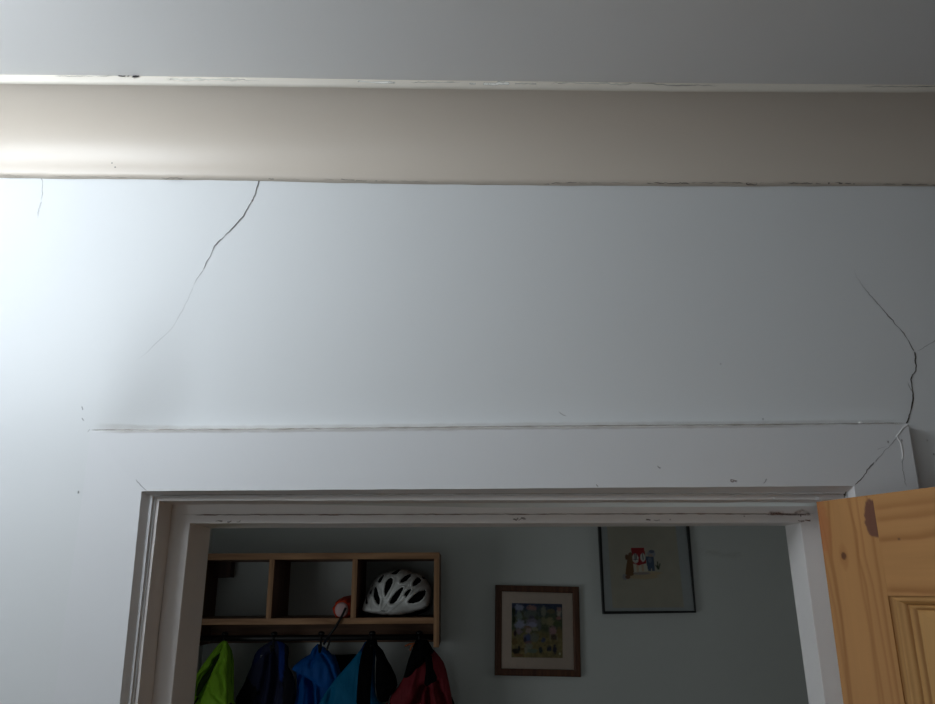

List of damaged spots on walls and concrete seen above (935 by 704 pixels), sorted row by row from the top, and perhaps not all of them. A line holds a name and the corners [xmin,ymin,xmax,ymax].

crack [196,178,270,280]